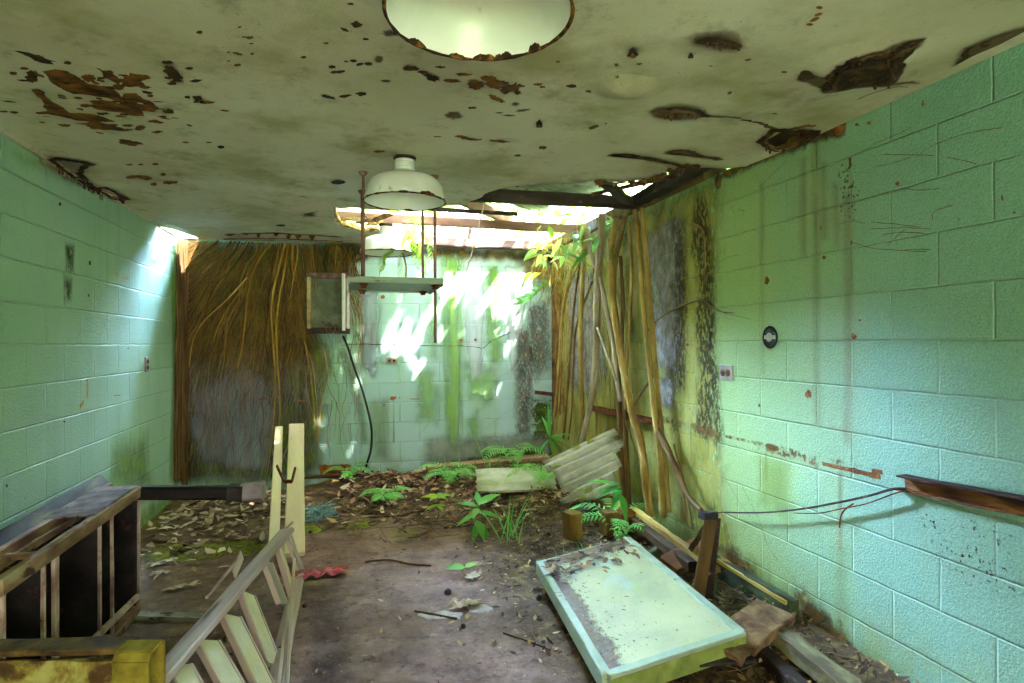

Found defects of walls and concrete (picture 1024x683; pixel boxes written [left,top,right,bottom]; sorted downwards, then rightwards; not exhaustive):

mould [65,246,73,298]
mould [672,196,722,443]
rust [592,406,883,480]